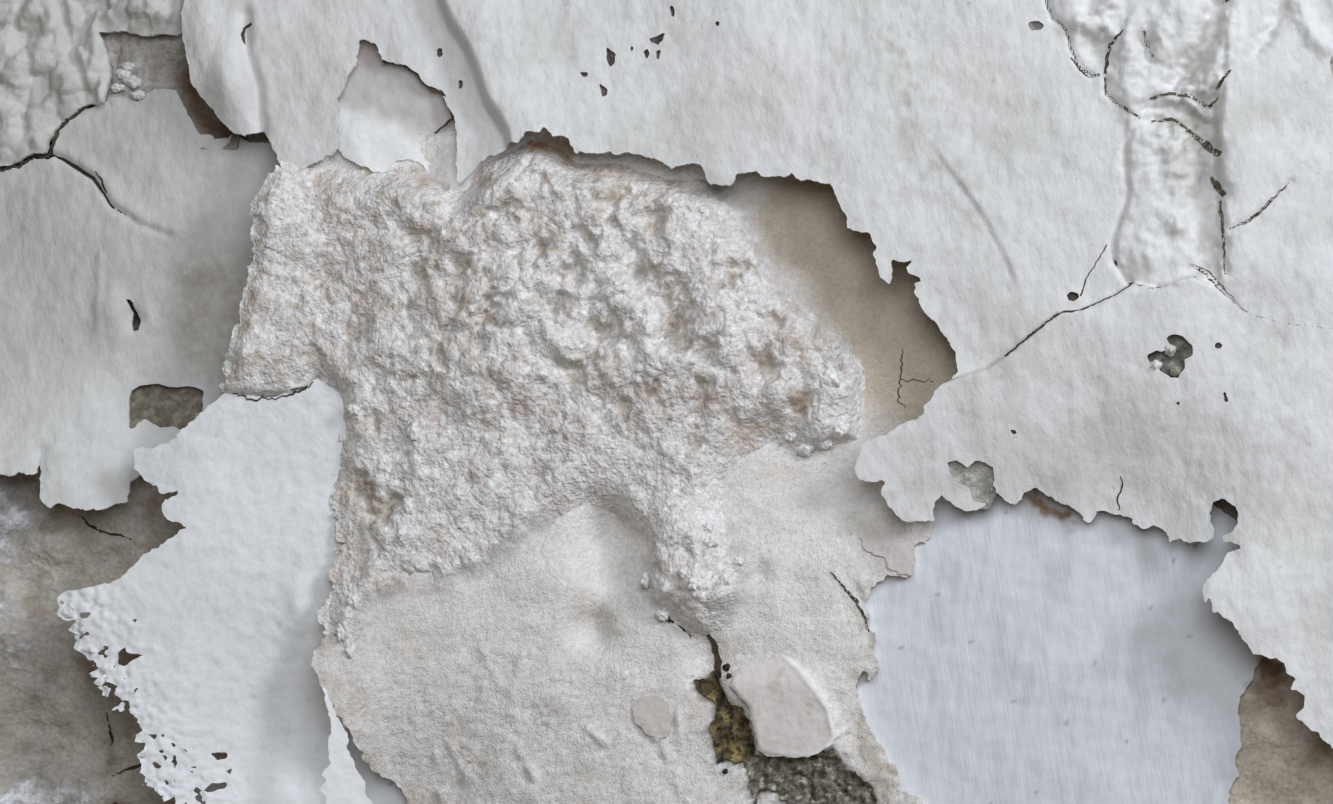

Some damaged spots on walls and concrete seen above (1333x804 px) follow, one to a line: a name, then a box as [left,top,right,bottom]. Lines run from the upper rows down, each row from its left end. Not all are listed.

peeling [607,34,665,66]
peeling [1028,22,1044,31]
crack [1045,0,1140,119]
crack [0,106,123,213]
crack [1005,244,1165,357]
flaking render [308,40,1333,804]
peeling [63,604,87,635]
peeling [89,666,111,697]
leakage [694,663,877,804]
peeling [147,778,174,802]